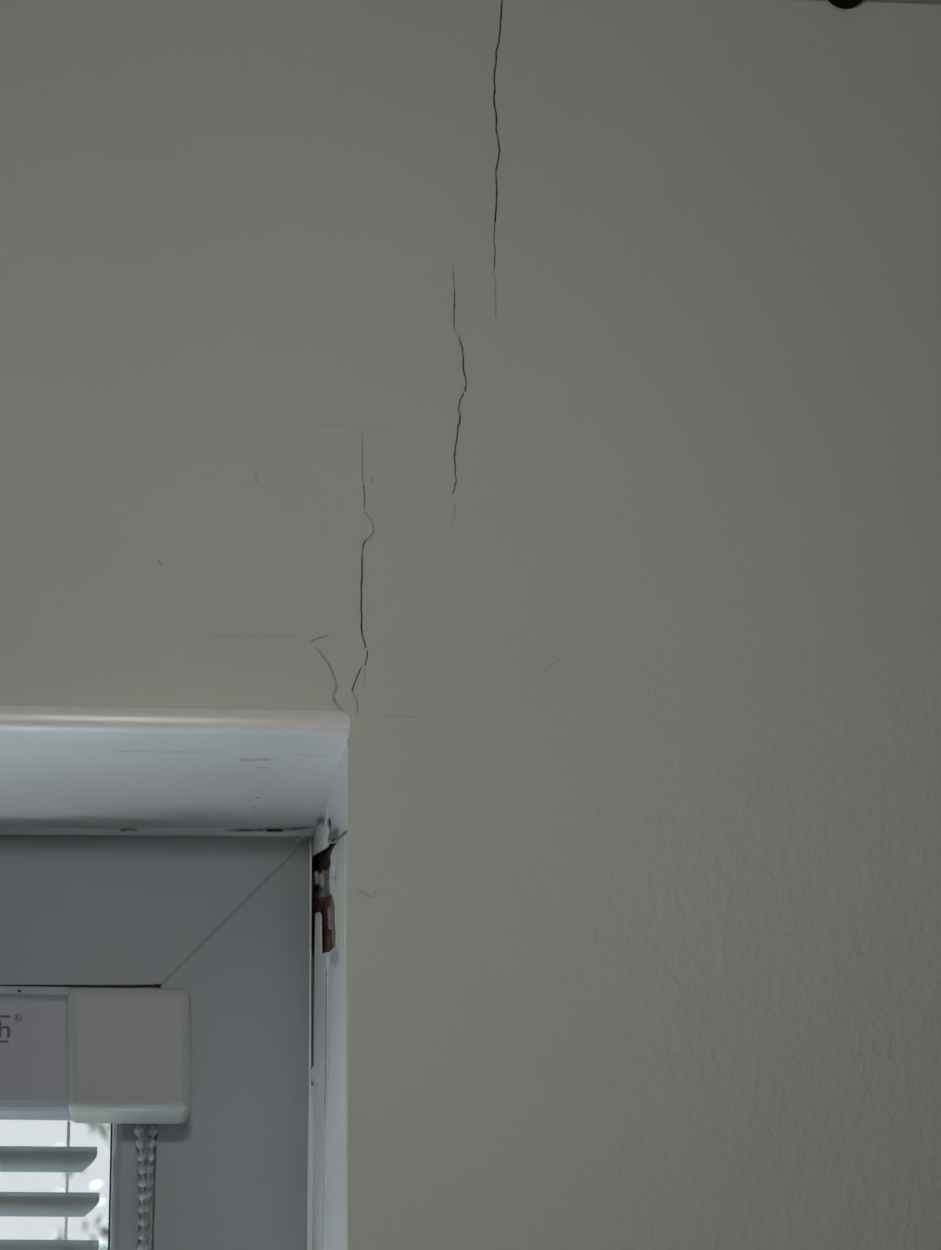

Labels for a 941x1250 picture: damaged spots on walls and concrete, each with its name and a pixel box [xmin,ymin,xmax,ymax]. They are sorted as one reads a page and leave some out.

crack [493,0,502,268]
crack [453,290,467,493]
crack [351,555,368,691]